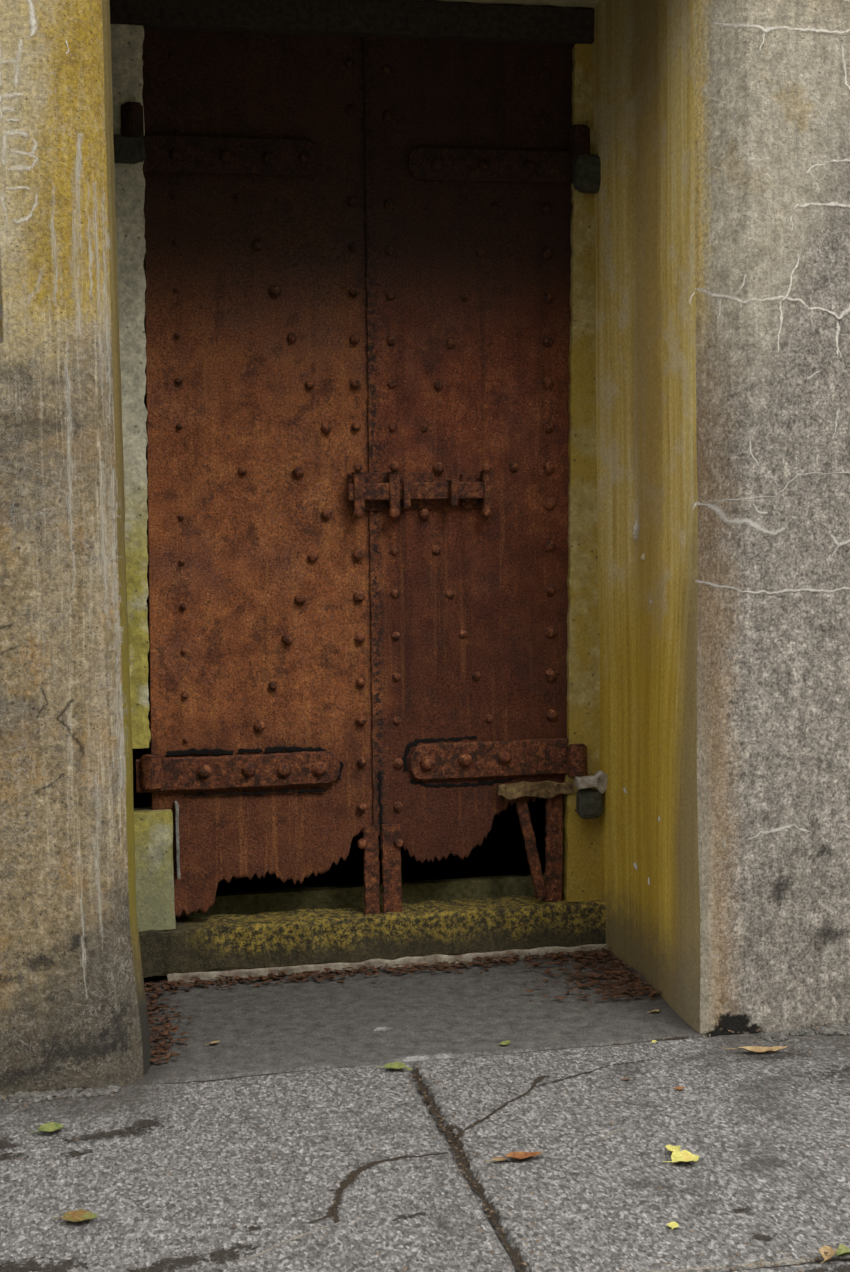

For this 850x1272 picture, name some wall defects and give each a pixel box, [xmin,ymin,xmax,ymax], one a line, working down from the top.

crack [28,0,36,36]
crack [713,22,850,89]
crack [807,159,850,173]
crack [690,201,850,379]
crack [832,408,840,439]
crack [694,472,850,535]
crack [696,580,850,594]
corrosion [166,746,344,781]
corrosion [402,736,512,788]
crack [234,1059,653,1261]